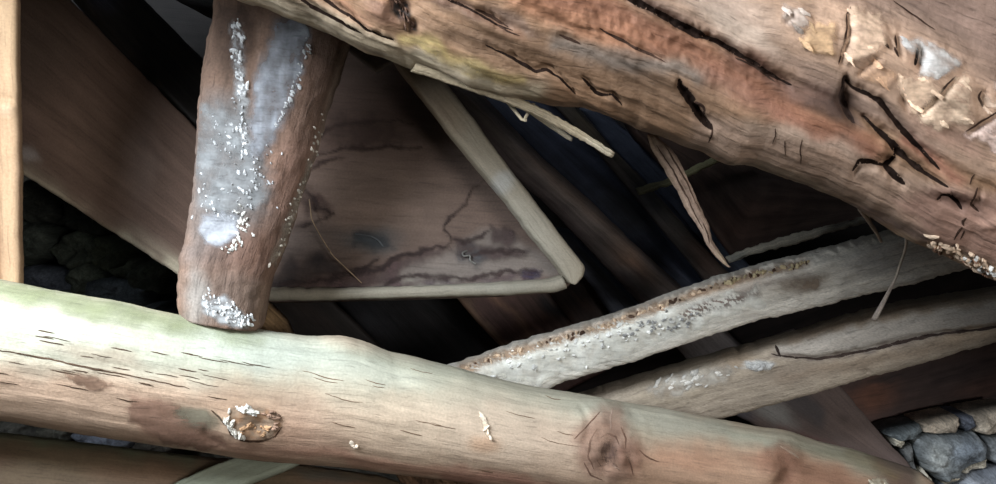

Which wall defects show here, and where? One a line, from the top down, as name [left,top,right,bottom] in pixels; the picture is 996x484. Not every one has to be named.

leakage [221,12,250,45]
leakage [191,19,312,254]
crack [301,0,394,41]
crack [448,0,622,105]
crack [600,28,713,143]
peeling [781,4,996,153]
crack [838,0,979,240]
crack [772,326,996,360]
leakage [176,408,217,427]
peeling [223,403,282,441]